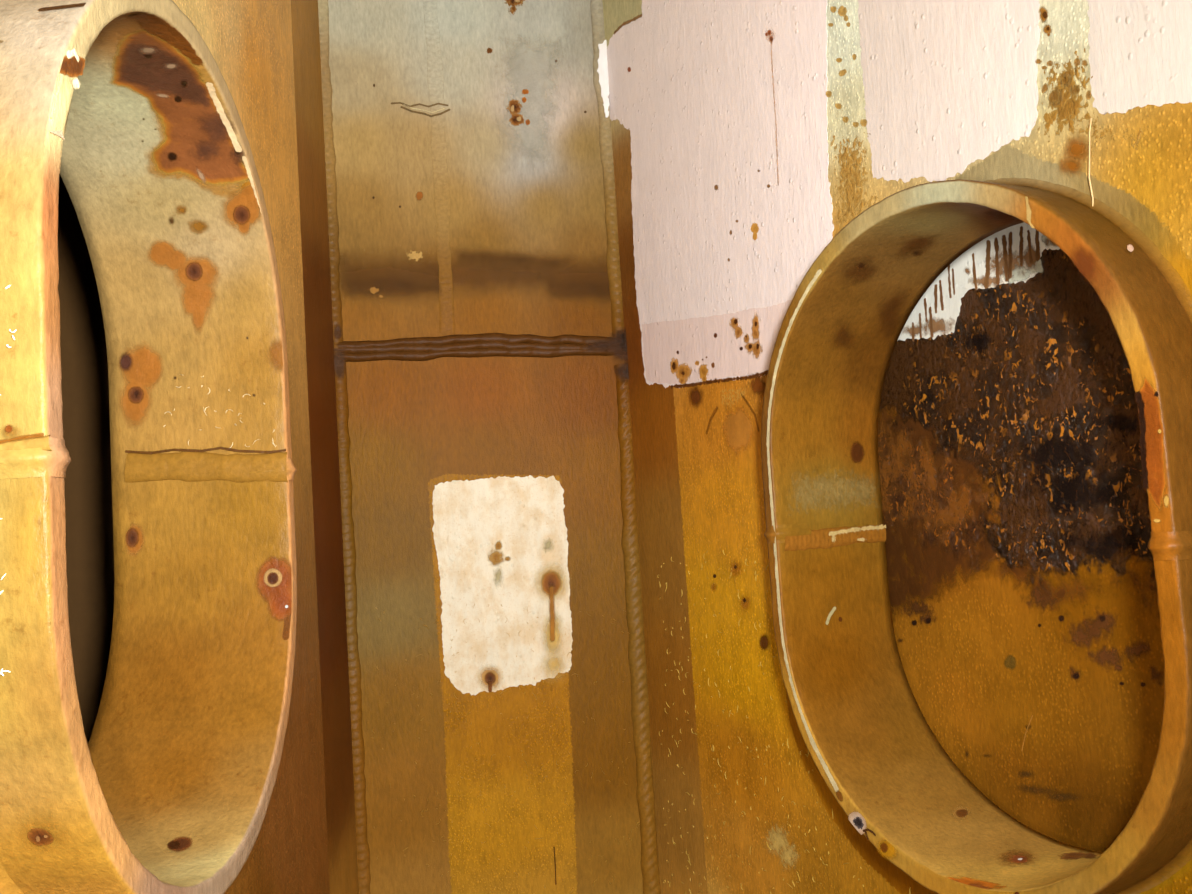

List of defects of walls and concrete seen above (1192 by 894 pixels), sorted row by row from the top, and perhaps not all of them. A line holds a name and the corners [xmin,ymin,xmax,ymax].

rust [1039,7,1051,36]
rust [60,48,85,89]
rust [112,13,260,234]
rust [1061,140,1087,172]
peeling [1025,196,1035,228]
rust [149,241,217,330]
rust [670,351,768,389]
rust [730,316,762,358]
rust [1135,378,1169,523]
rust [878,405,1150,685]
rust [257,557,292,640]
rust [541,570,563,670]